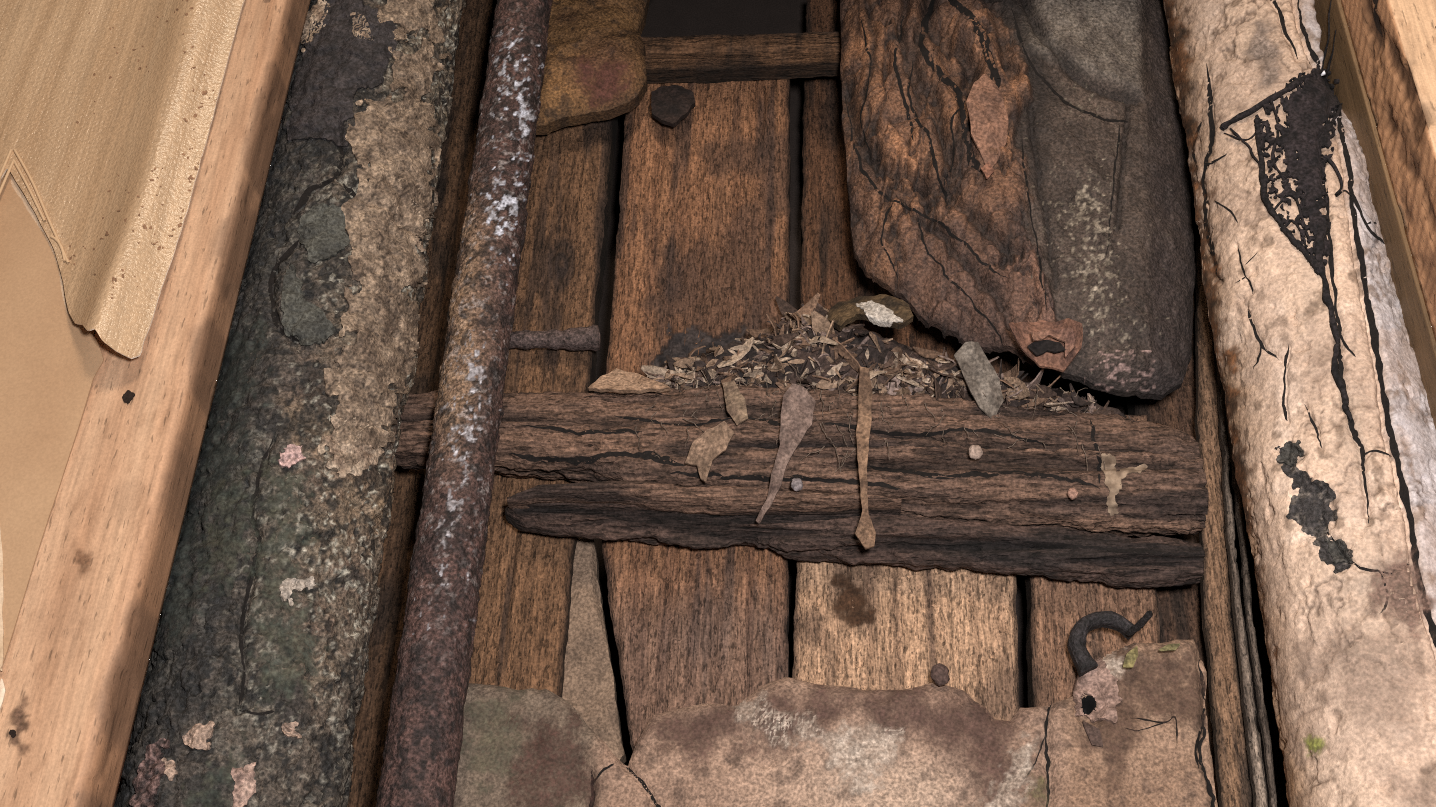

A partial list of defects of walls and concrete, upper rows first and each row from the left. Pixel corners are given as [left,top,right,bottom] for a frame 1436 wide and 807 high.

crack [1270,0,1321,67]
crack [1372,0,1383,37]
crack [1191,63,1436,647]
peeling [279,576,316,607]
peeling [281,721,302,739]
peeling [129,721,215,807]
peeling [231,762,256,807]
crack [589,763,661,807]